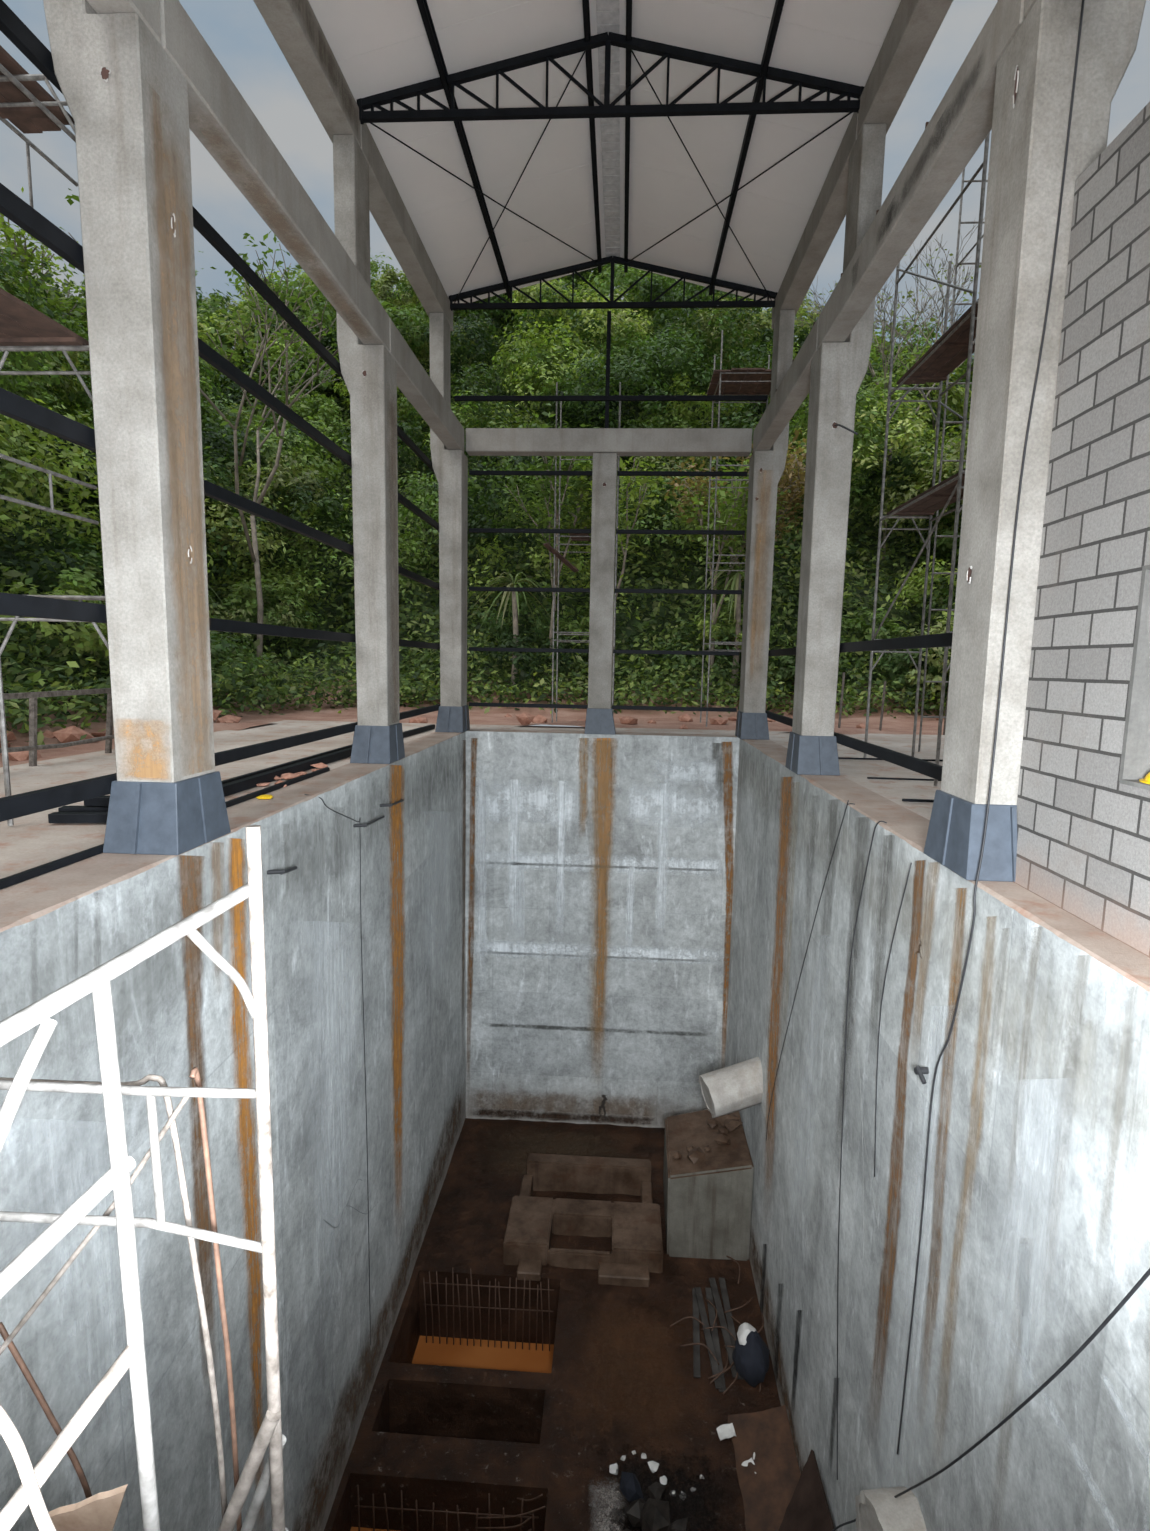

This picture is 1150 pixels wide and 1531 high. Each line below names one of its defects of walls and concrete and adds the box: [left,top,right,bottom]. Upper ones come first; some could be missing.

corrosion [180,838,261,1436]
corrosion [391,765,404,1177]
corrosion [580,738,612,1029]
corrosion [767,777,792,1140]
corrosion [874,860,937,1364]
corrosion [928,888,966,1309]
corrosion [963,989,989,1203]